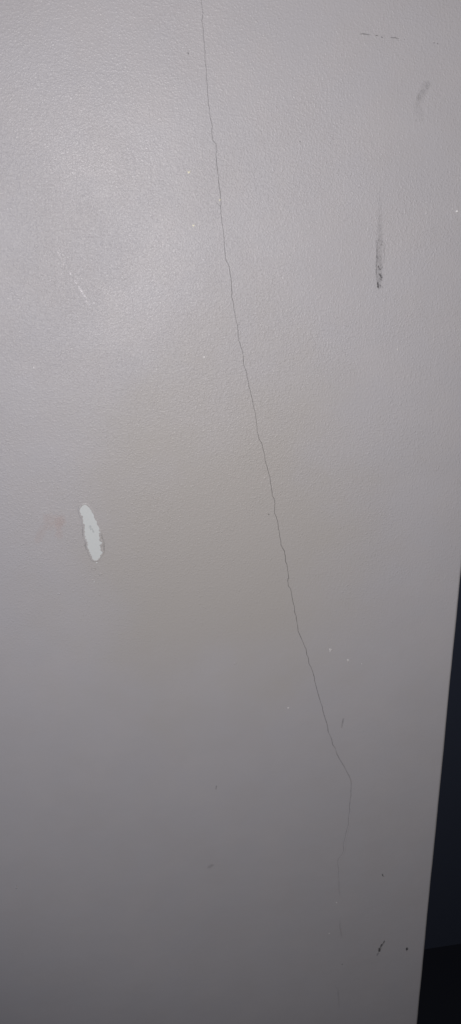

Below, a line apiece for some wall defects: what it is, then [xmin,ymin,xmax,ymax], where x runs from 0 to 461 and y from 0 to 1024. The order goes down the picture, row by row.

spalling [78,503,104,582]